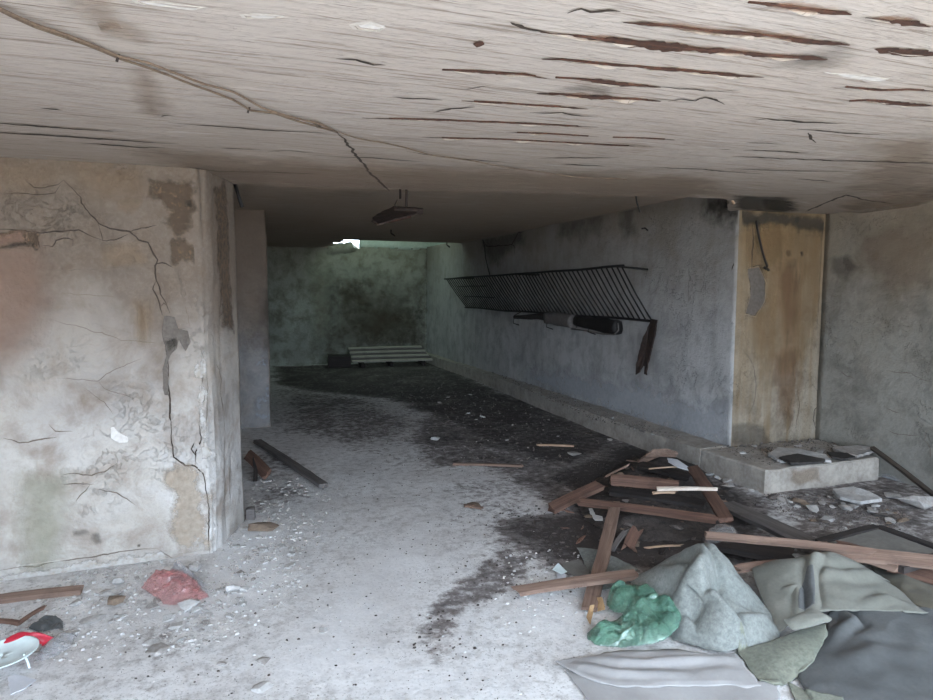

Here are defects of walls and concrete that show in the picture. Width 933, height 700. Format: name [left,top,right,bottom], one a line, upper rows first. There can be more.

crack [510,22,549,33]
crack [569,6,621,14]
crack [342,58,380,66]
crack [397,86,485,113]
crack [666,87,739,105]
crack [0,108,427,190]
crack [0,176,173,313]
flaking render [149,180,197,265]
flaking render [745,265,767,318]
spalling [161,314,193,398]
crack [2,426,67,446]
crack [55,320,231,553]